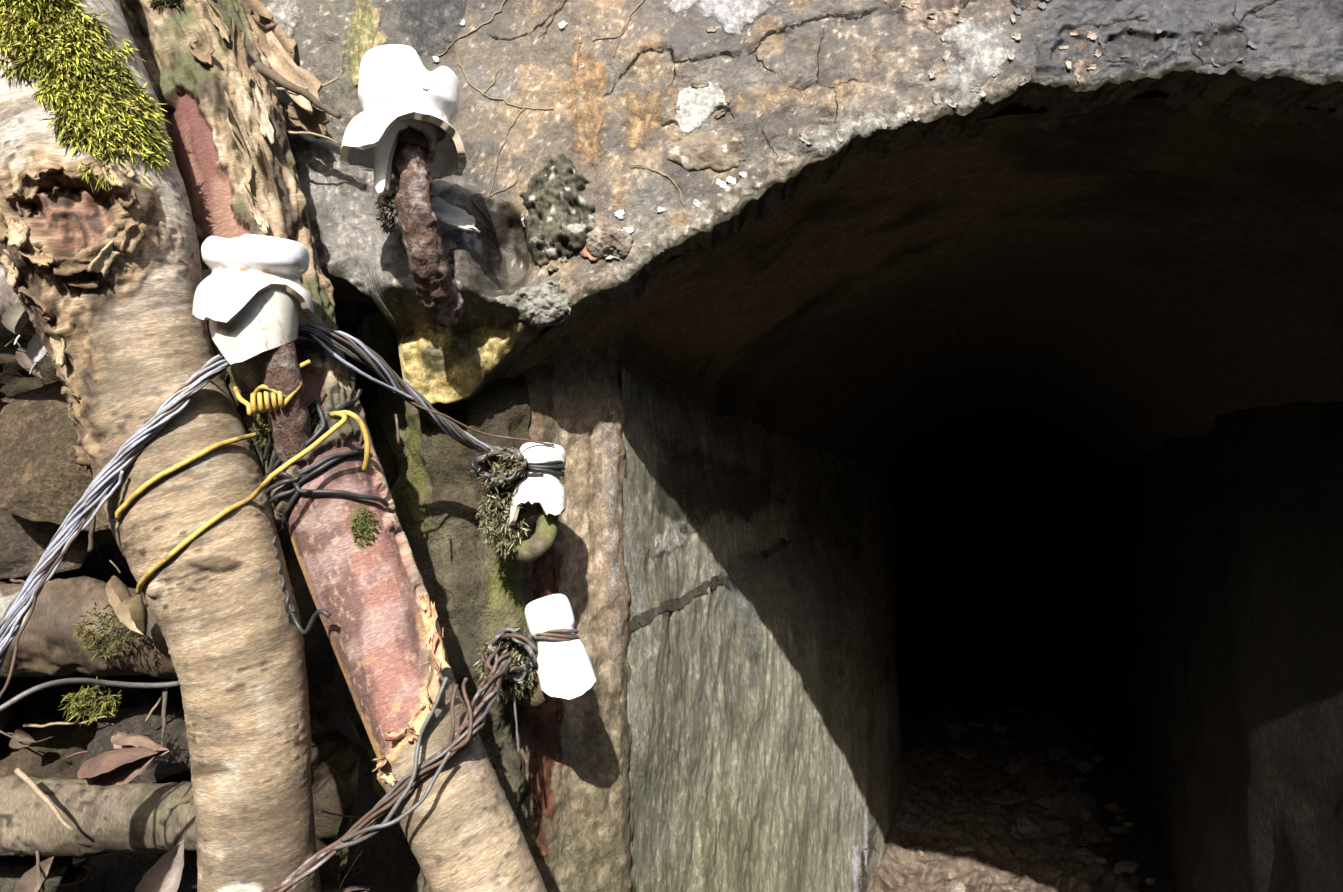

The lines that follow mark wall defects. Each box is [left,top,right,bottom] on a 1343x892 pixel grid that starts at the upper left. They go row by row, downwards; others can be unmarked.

crack [486,0,567,40]
peeling [669,0,776,33]
crack [602,9,878,126]
crack [710,104,778,156]